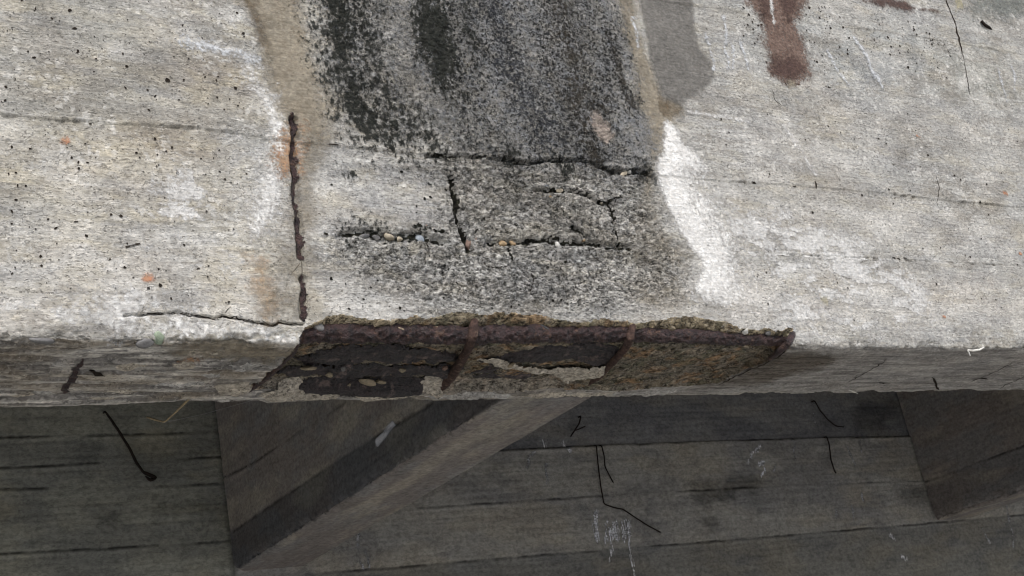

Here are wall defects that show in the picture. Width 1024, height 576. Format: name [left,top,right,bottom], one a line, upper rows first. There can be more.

corrosion [745,0,812,86]
crack [946,0,970,93]
leakage [143,168,210,221]
corrosion [271,119,308,179]
leakage [179,0,938,342]
crack [137,308,303,327]
spalling [156,312,796,402]